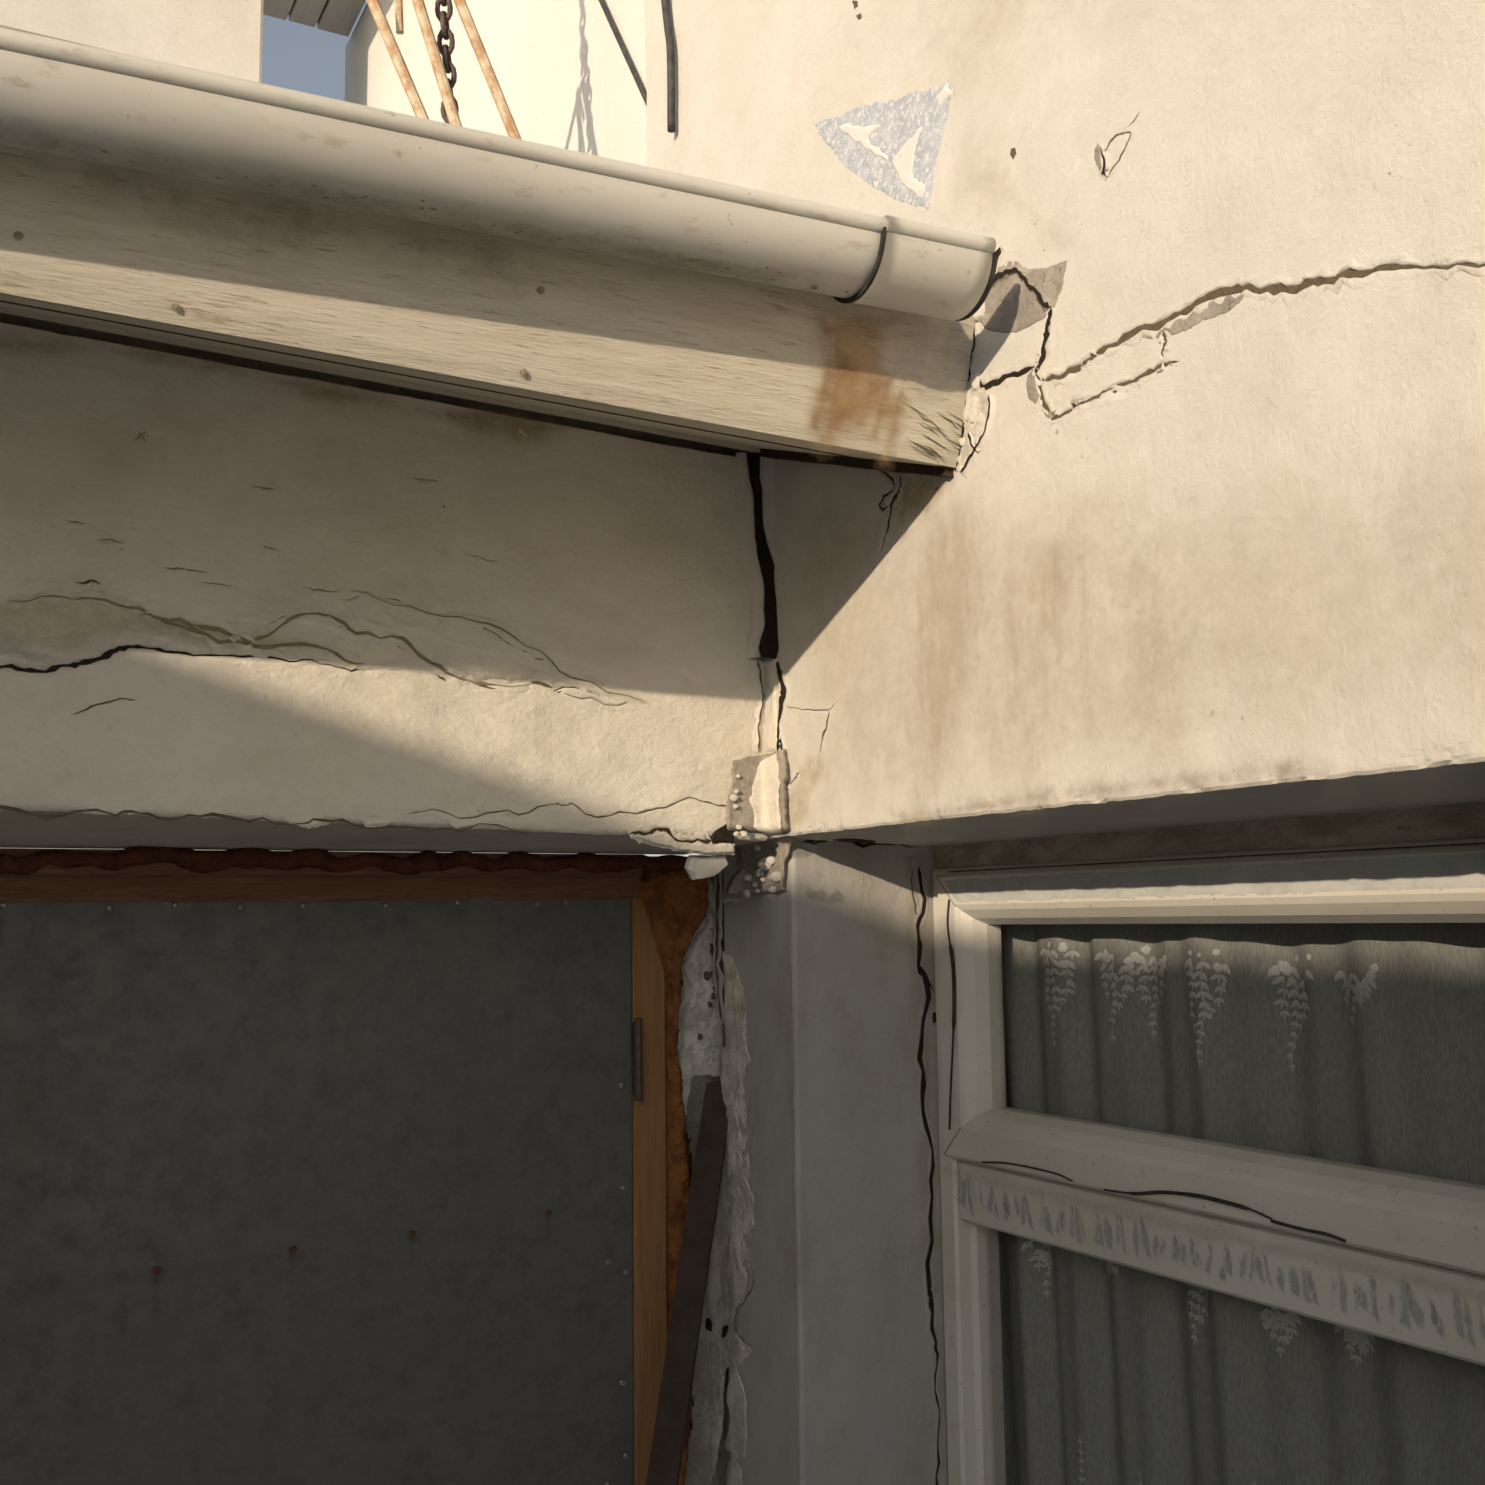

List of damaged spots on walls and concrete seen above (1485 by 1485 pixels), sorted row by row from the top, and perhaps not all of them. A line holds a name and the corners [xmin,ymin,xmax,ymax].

peeling [814,82,953,210]
crack [995,246,1006,273]
flaking render [973,260,1068,333]
crack [953,252,1485,474]
crack [736,453,837,792]
crack [876,470,907,554]
flaking render [627,657,806,1485]
crack [792,838,944,1485]